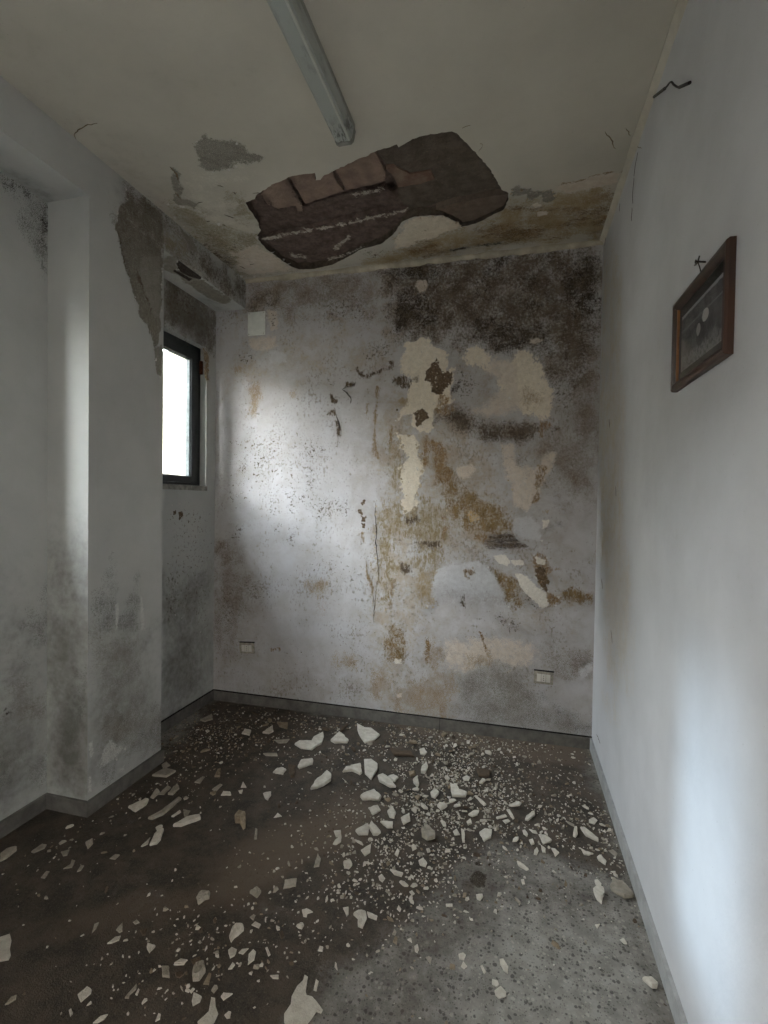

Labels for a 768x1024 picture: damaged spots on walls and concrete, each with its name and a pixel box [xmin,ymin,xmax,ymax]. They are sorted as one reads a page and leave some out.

spalling [109,188,232,379]
peeling [187,133,265,189]
spalling [246,131,621,269]
leakage [122,167,631,736]
peeling [382,336,556,514]
spalling [471,509,563,609]